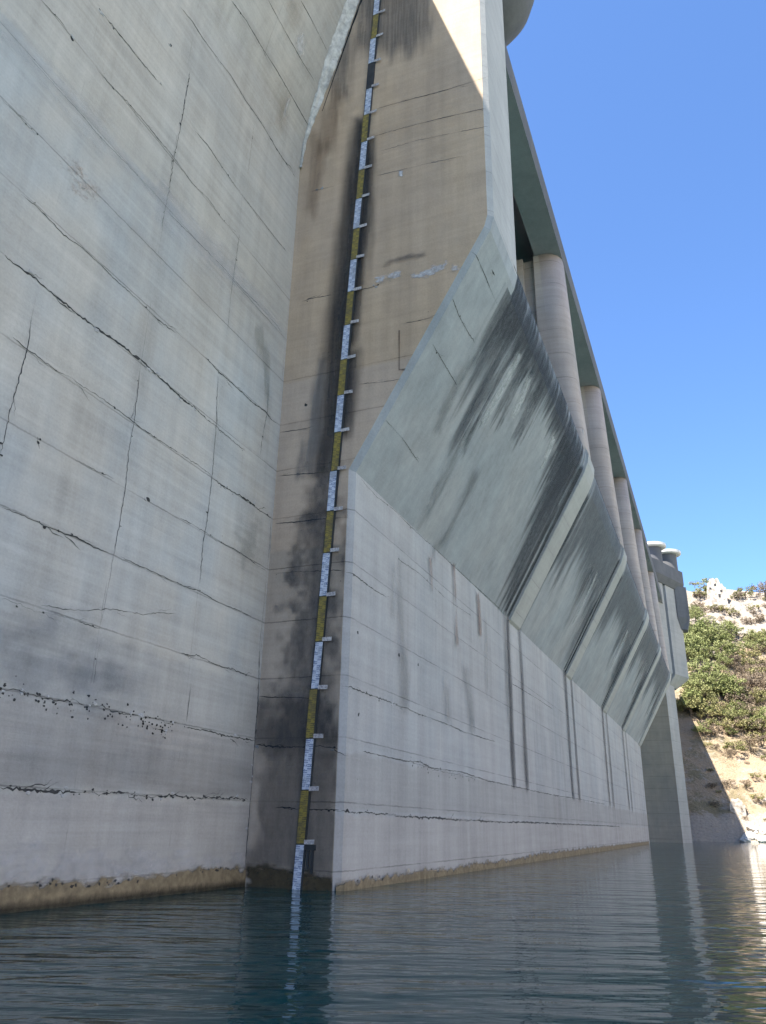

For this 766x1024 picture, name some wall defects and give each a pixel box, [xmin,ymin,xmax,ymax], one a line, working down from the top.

crack [21,8,294,331]
crack [231,0,307,123]
leakage [316,121,373,505]
crack [0,255,618,867]
leakage [457,281,583,785]
leakage [0,841,649,914]